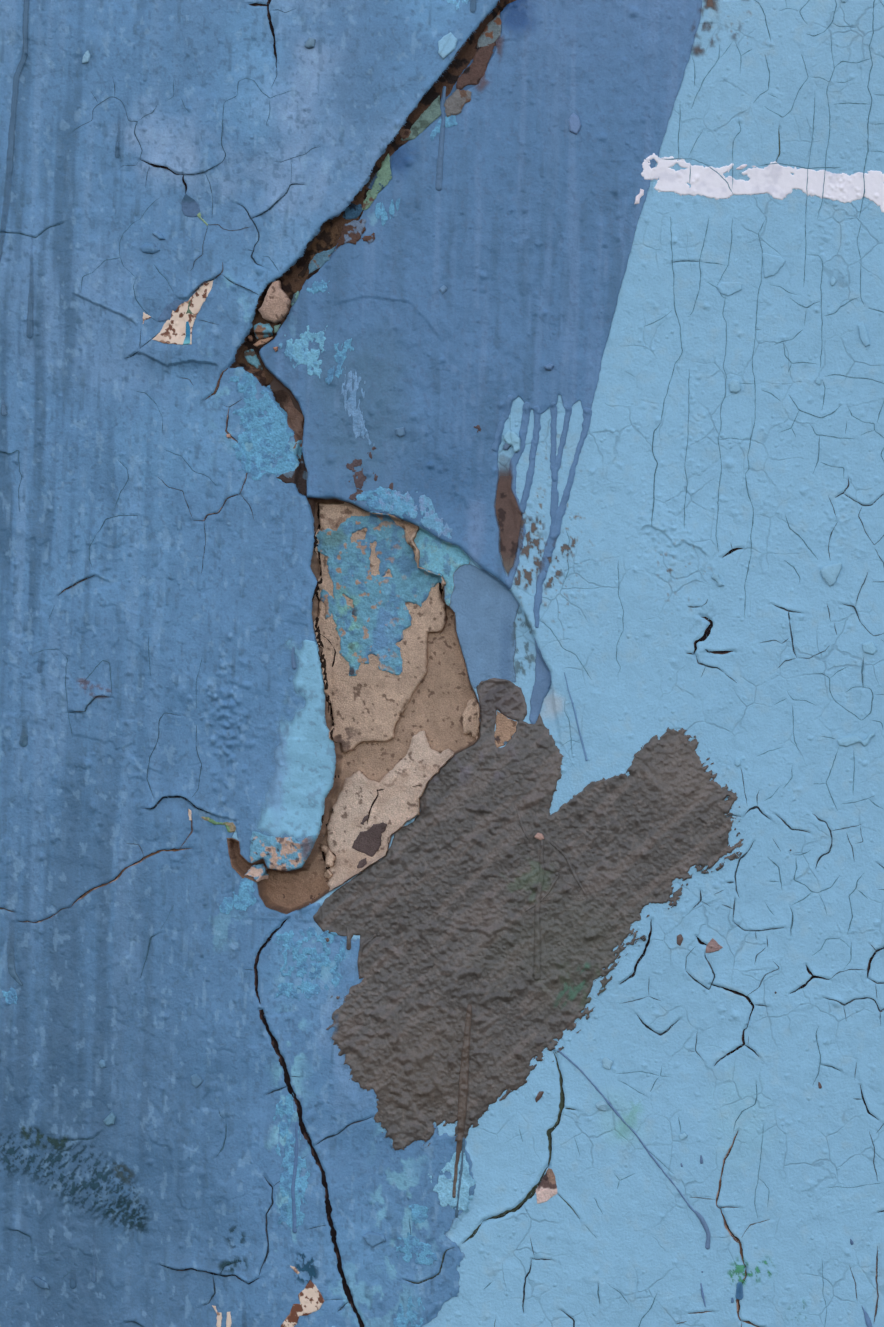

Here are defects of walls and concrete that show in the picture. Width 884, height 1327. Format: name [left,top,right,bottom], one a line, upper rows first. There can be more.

peeling [143,281,213,345]
crack [34,0,516,737]
flaking render [188,325,480,914]
crack [539,569,624,677]
crack [561,0,884,1327]
peeling [272,927,346,1001]
crack [162,918,373,1327]
peeling [281,1266,324,1327]
crack [403,1054,668,1327]